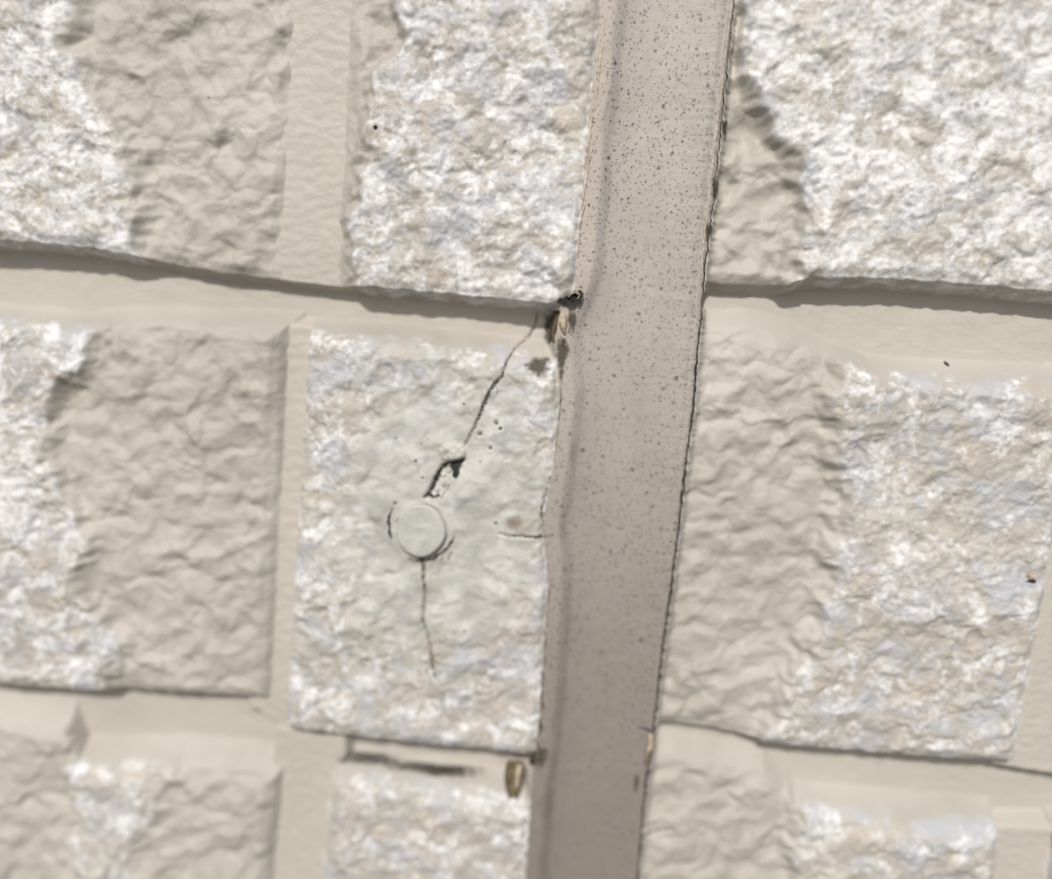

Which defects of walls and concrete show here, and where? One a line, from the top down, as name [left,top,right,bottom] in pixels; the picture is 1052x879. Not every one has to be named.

crack [465,314,538,445]
crack [502,349,562,539]
crack [652,328,701,730]
crack [637,768,670,879]